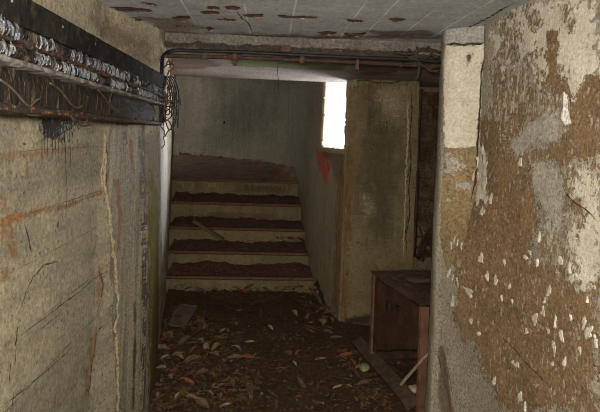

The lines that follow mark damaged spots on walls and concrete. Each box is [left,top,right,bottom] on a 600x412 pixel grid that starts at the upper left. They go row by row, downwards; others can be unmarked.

corrosion [0,191,103,237]
crack [357,80,413,251]
crack [470,60,484,202]
peeling [439,1,600,412]
crack [561,184,594,218]